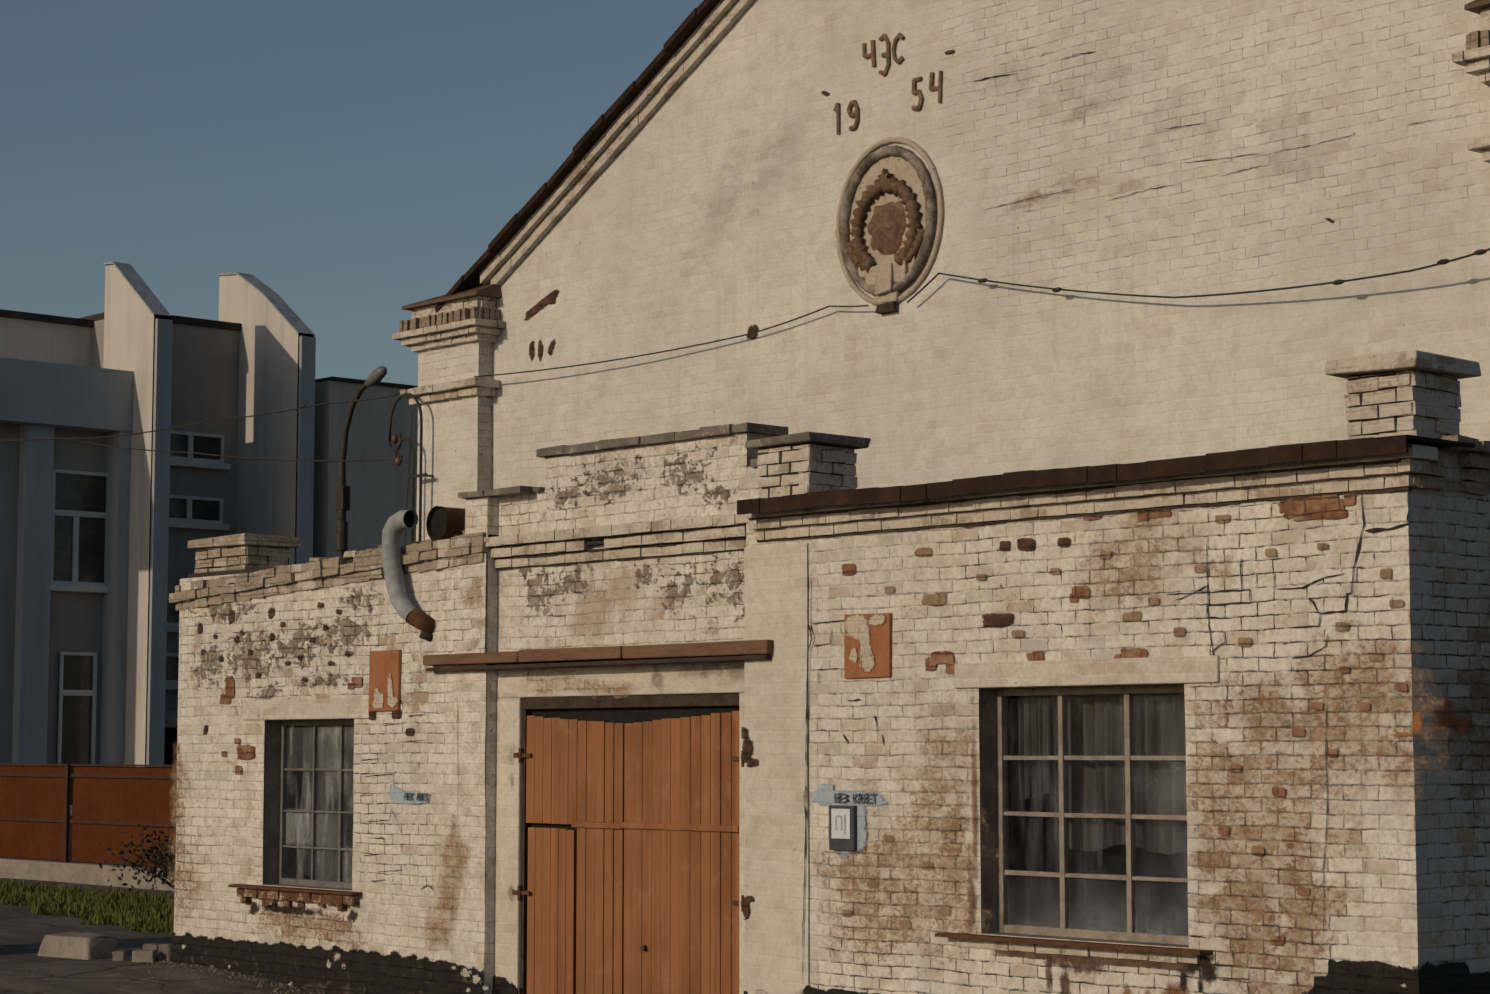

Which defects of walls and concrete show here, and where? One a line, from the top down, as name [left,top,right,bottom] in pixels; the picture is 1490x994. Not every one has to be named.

peeling [546,446,736,512]
peeling [189,583,413,736]
peeling [514,563,593,620]
peeling [626,552,745,622]
crack [1165,493,1414,658]
water stain [994,640,1442,994]
crack [1309,695,1328,947]